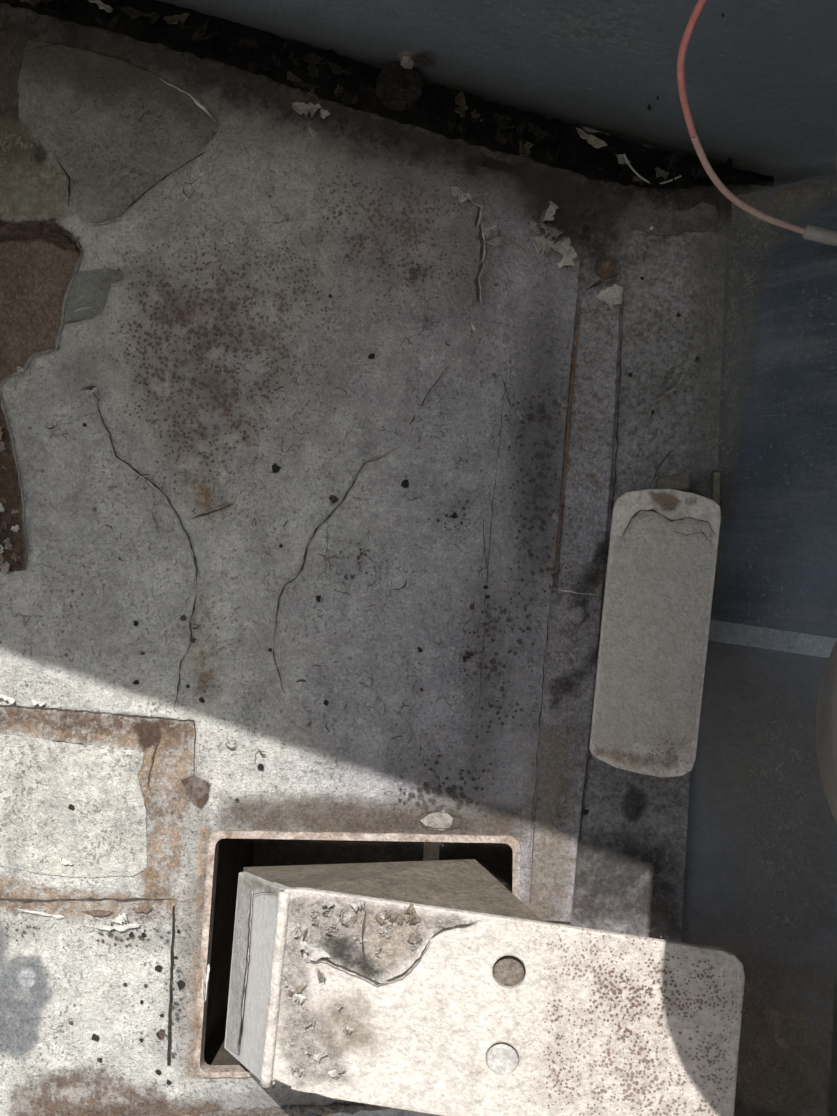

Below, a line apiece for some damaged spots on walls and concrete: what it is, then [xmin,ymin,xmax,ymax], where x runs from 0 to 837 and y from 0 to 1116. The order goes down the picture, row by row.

peeling [18,40,218,225]
crack [0,385,198,810]
crack [273,365,449,691]
rust [0,708,195,919]